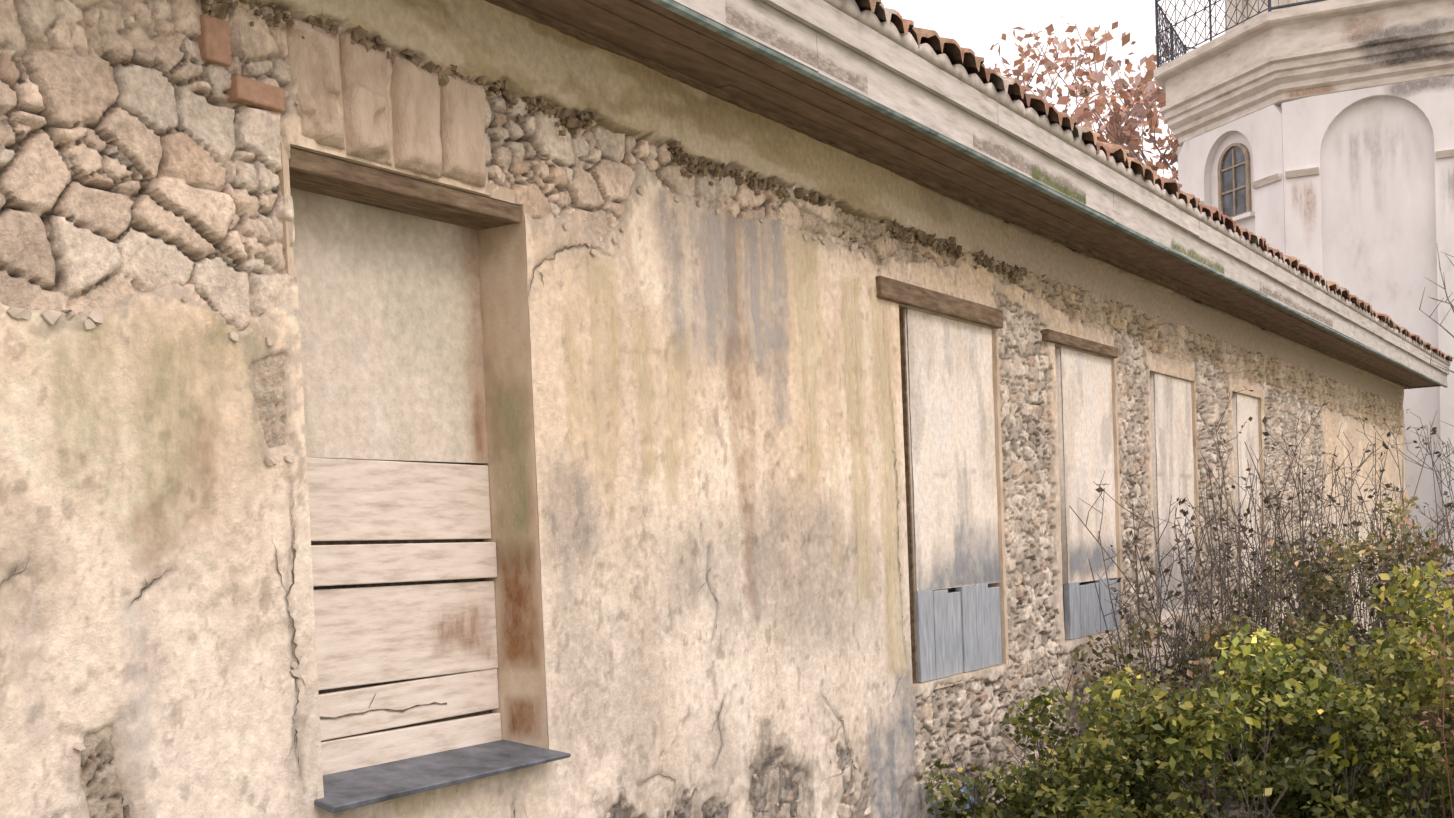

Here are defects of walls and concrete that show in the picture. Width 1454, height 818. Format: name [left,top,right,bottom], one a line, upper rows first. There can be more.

damp [1359,19,1453,94]
spalling [0,0,298,342]
spalling [248,336,294,466]
damp [703,215,818,487]
damp [844,279,905,670]
spalling [485,83,1403,800]
crack [272,498,447,792]
spalling [73,726,131,818]
spalling [605,801,639,818]
spalling [667,790,729,818]
spalling [749,748,799,818]